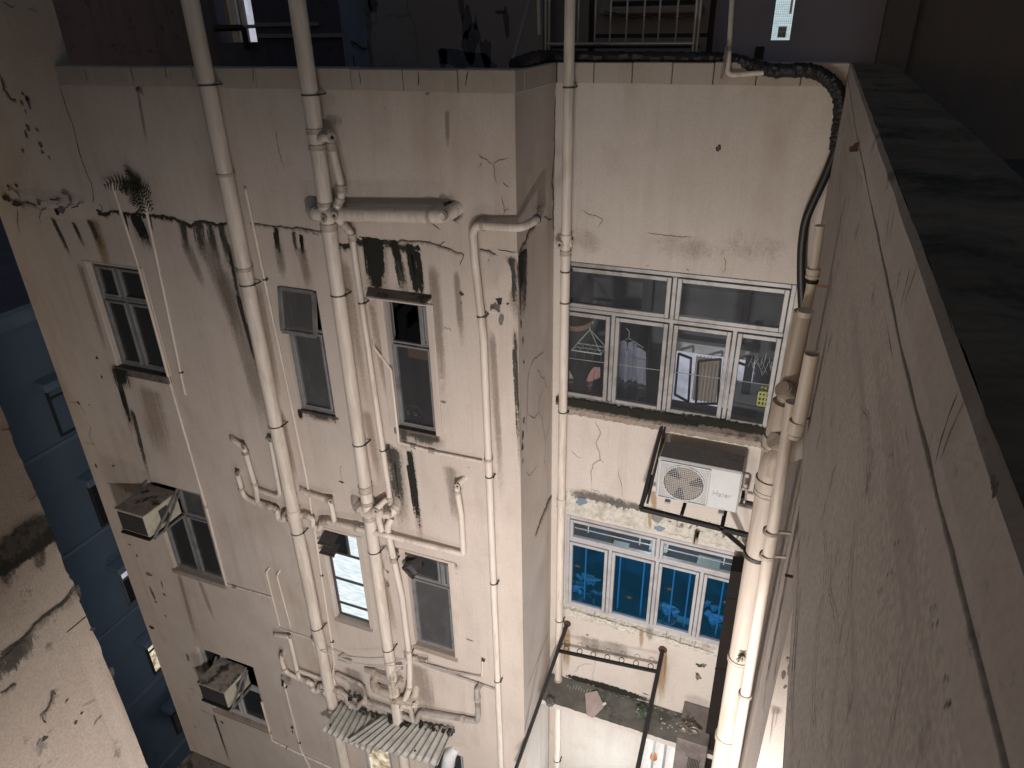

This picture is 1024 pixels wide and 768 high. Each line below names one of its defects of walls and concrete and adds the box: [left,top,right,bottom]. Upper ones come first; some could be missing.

crack [17,81,556,264]
damp [72,209,105,259]
damp [124,215,152,247]
damp [179,220,254,359]
damp [362,237,424,294]
damp [508,249,528,316]
damp [512,333,520,436]
damp [386,430,437,525]
spalling [651,515,665,532]
crack [0,586,80,658]